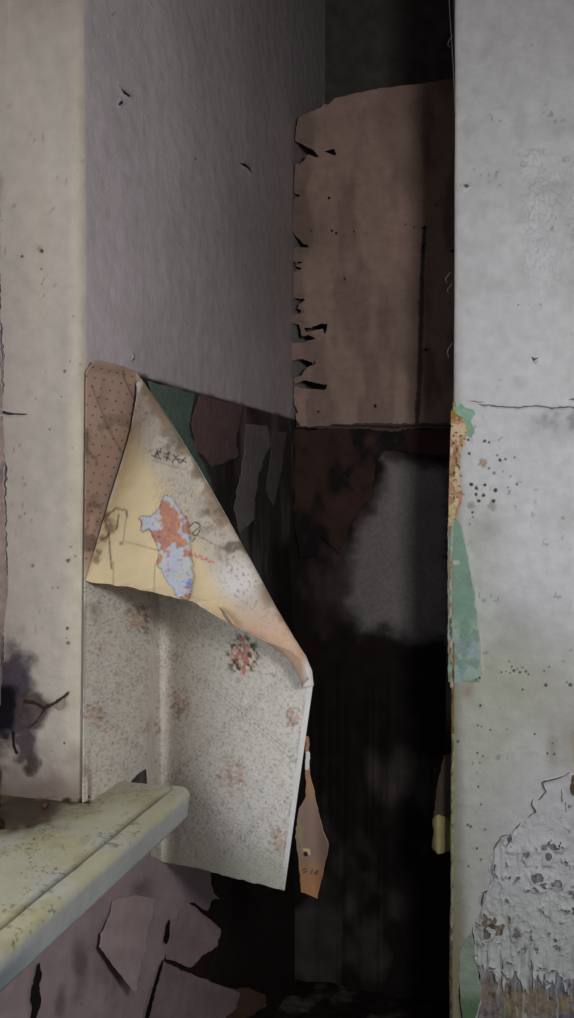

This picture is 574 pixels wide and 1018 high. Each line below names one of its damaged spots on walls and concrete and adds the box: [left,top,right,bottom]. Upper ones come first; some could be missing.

crack [470,396,574,412]
damp [0,652,69,775]
peeling [82,360,314,891]
peeling [474,799,574,1018]